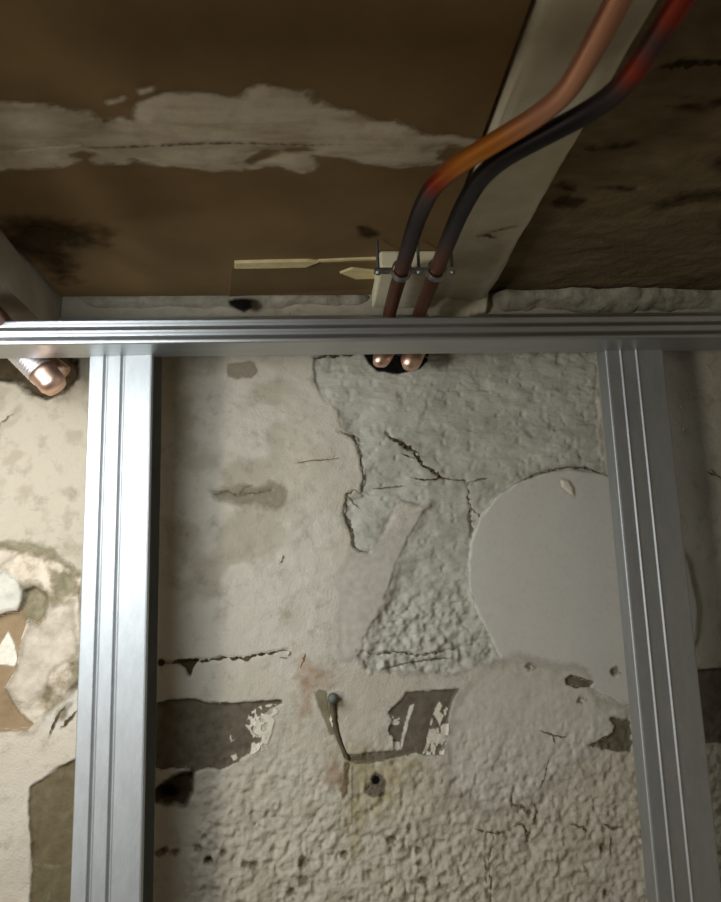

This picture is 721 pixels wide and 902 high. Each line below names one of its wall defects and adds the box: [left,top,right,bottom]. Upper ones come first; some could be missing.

crack [294,430,486,553]
spalling [313,352,604,676]
peeling [0,542,82,733]
spalling [156,699,282,772]
crack [159,650,291,665]
spalling [347,689,458,764]
crack [367,649,454,669]
spalling [566,675,593,703]
crack [475,730,566,902]
crack [570,823,621,855]